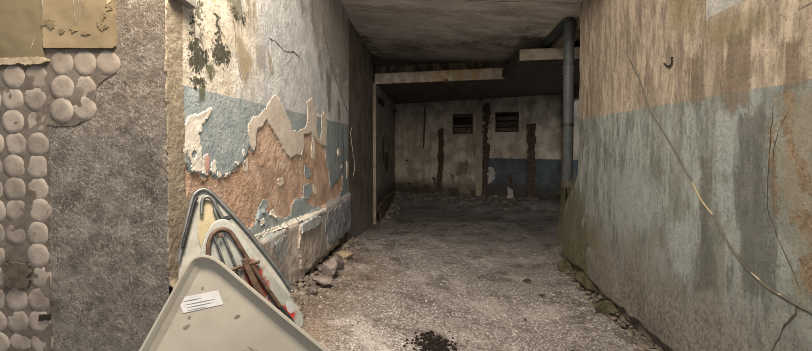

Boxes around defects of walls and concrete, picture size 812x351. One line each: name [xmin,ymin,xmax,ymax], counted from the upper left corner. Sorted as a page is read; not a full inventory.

leakage [185,0,273,101]
flaking render [164,0,349,288]
crack [771,302,800,351]